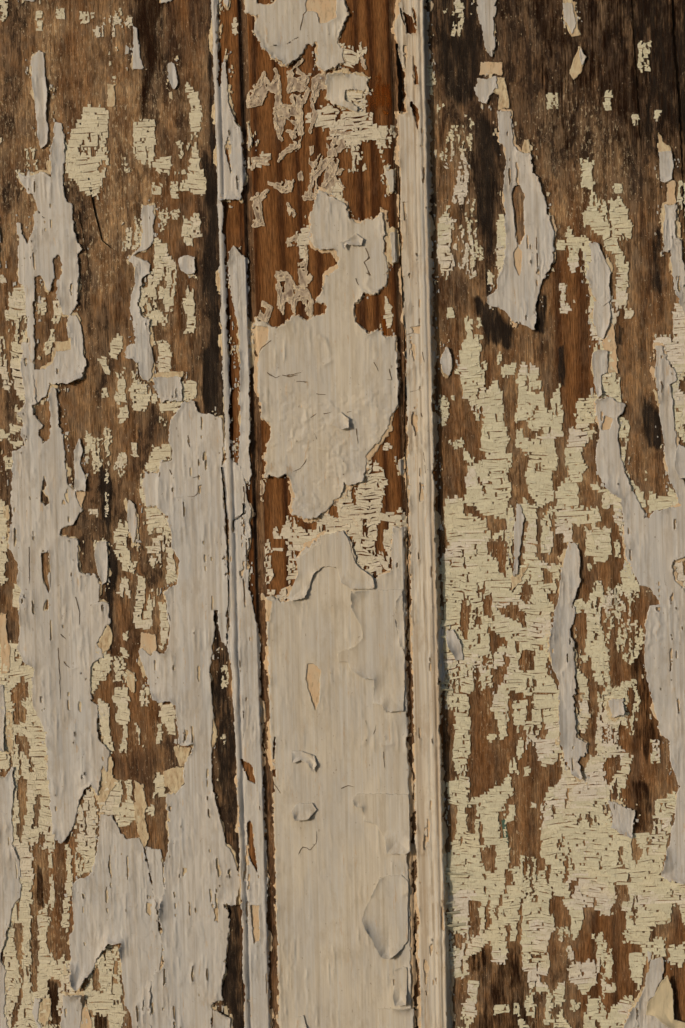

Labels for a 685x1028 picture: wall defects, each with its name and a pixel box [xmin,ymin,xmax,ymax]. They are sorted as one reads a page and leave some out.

peeling [79,8,147,71]
peeling [443,0,465,37]
peeling [470,0,499,57]
peeling [561,0,587,80]
peeling [637,40,652,73]
peeling [132,82,207,199]
peeling [436,125,484,280]
peeling [582,189,634,319]
peeling [438,339,452,378]
peeling [113,498,155,630]
peeling [584,524,612,564]
peeling [566,932,616,999]